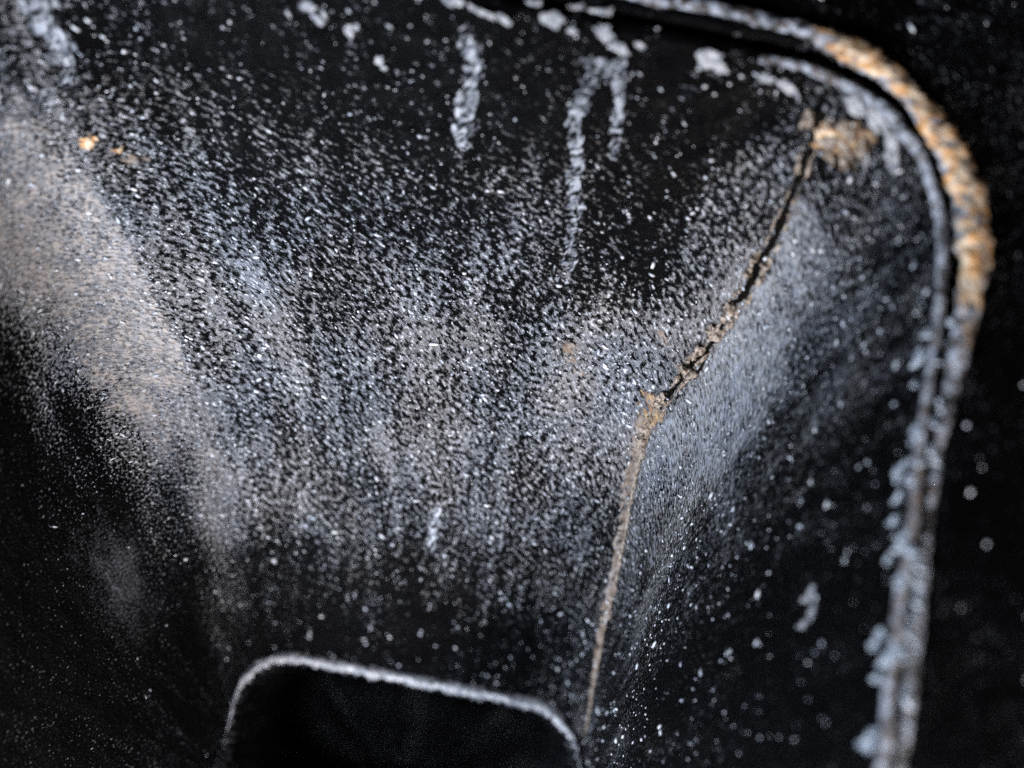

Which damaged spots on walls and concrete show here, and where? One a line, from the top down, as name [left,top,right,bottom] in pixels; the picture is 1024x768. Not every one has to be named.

damp [449,24,484,158]
damp [527,56,627,306]
crack [652,109,830,424]
rust [811,26,994,349]